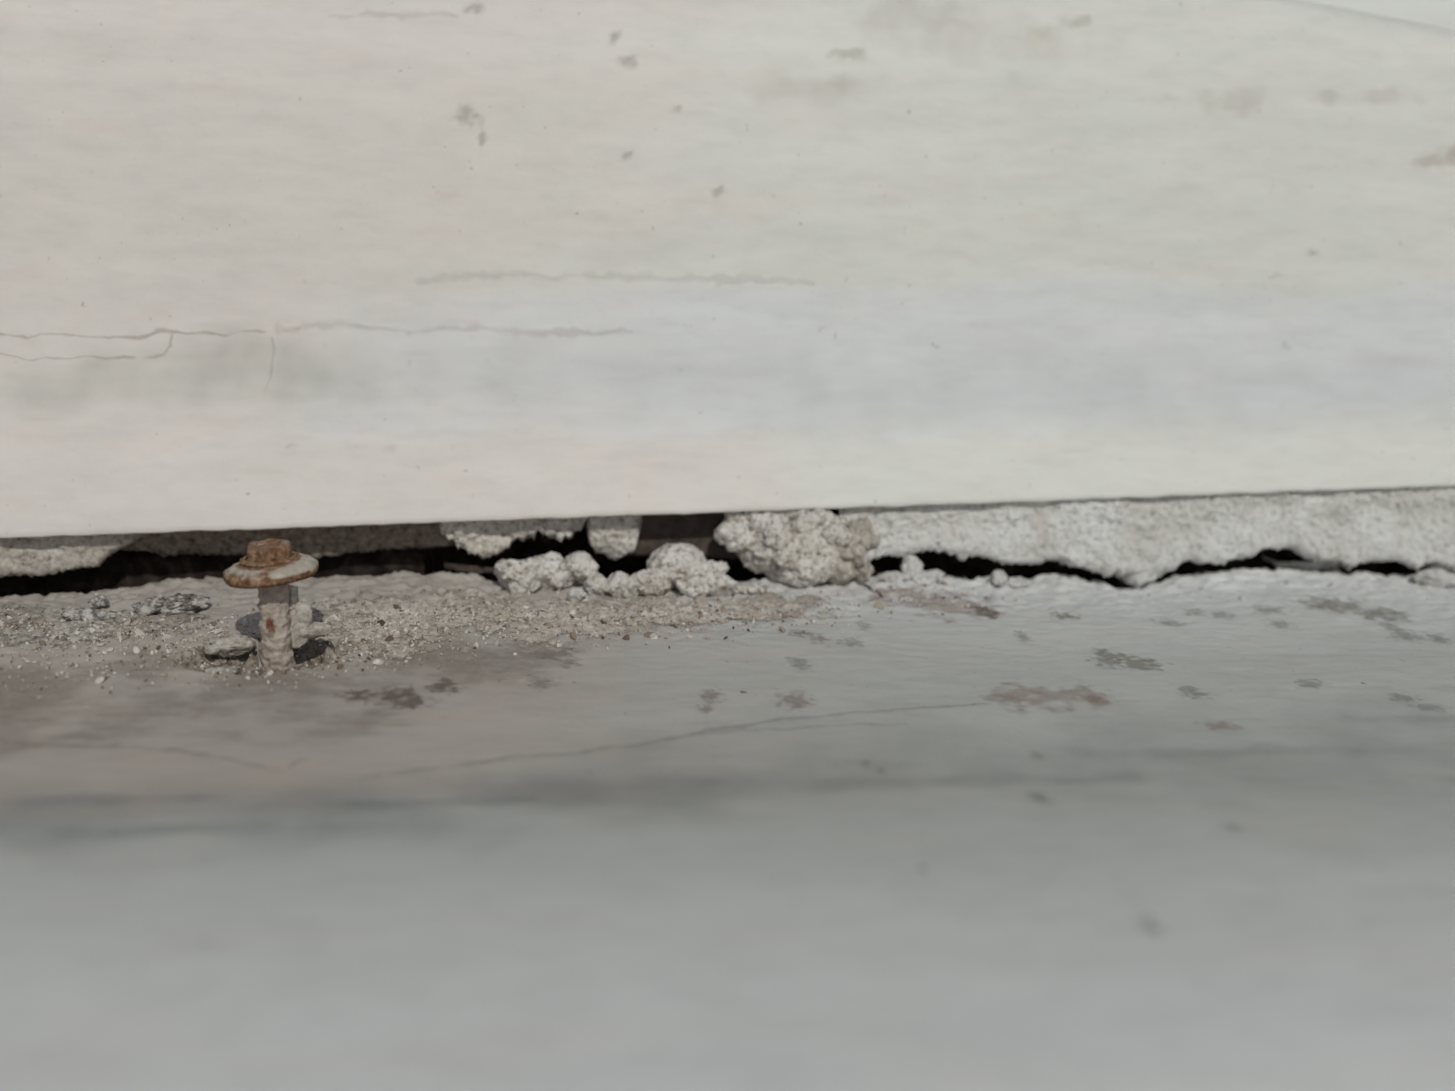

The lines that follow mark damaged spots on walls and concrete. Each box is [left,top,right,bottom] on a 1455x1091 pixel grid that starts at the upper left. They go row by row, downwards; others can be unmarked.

spalling [839,486,1455,589]